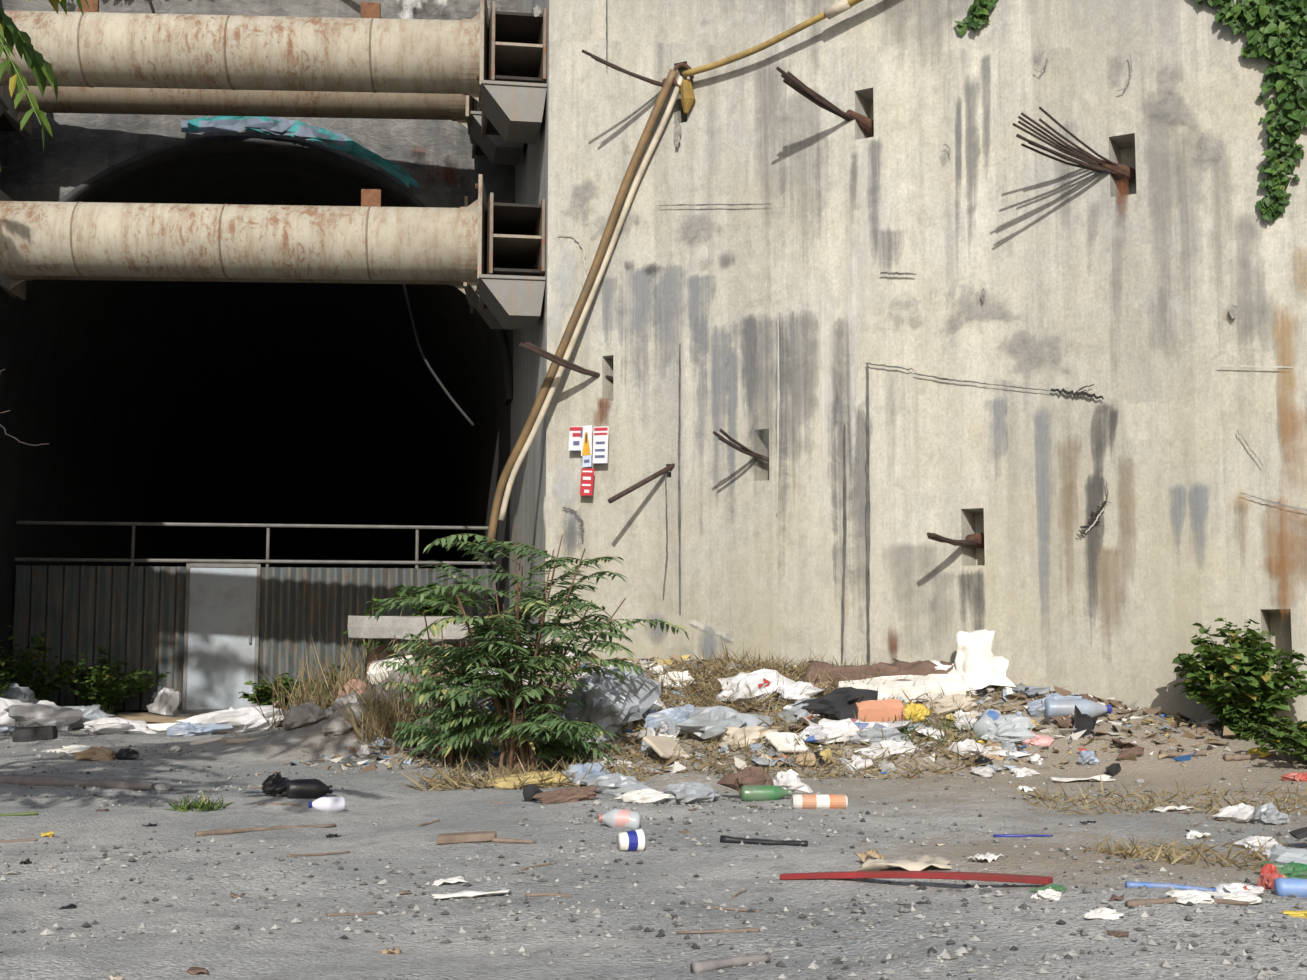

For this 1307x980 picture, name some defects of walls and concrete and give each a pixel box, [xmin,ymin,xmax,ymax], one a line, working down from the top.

leakage [603,142,891,533]
crack [865,362,1103,399]
leakage [1035,413,1049,599]
leakage [1087,405,1117,597]